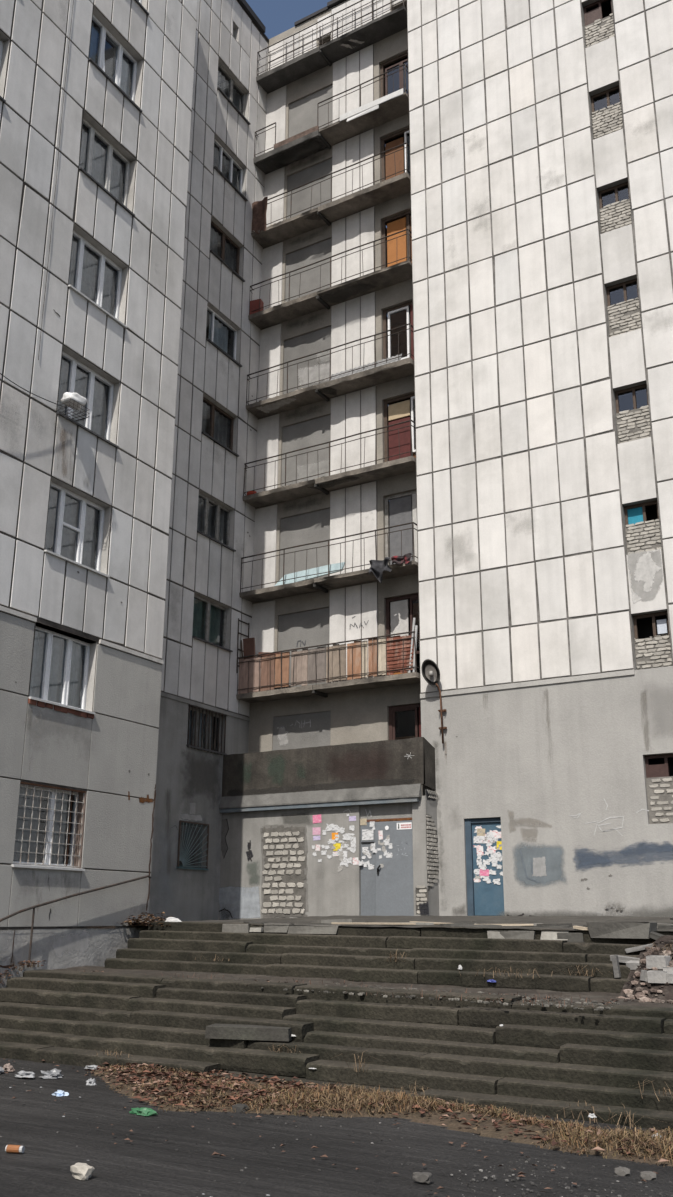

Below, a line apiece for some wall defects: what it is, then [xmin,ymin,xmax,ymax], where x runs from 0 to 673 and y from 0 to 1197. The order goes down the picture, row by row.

peeling [628,551,663,603]